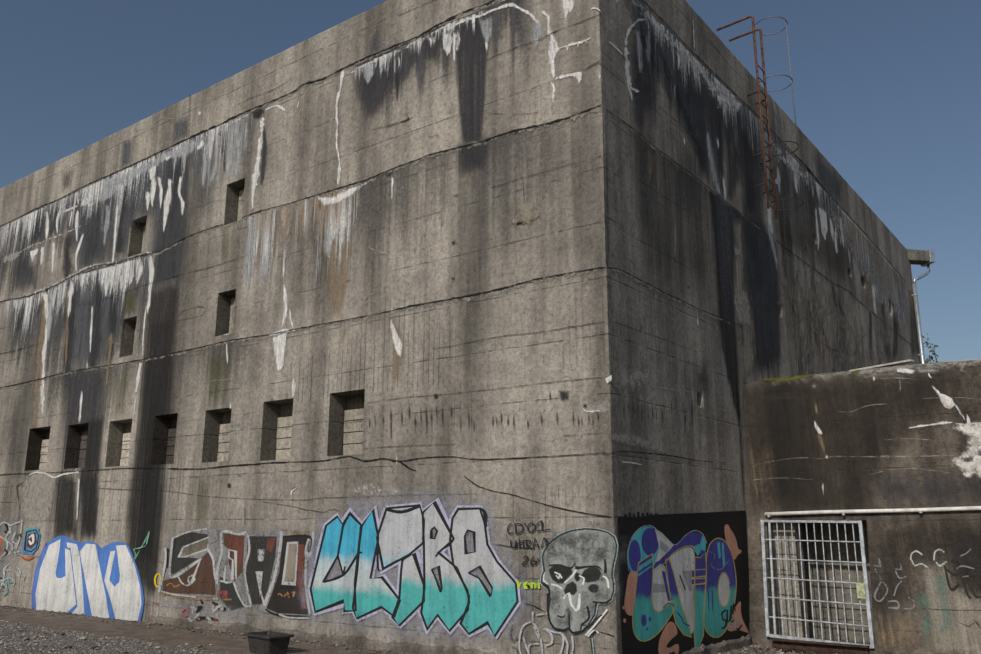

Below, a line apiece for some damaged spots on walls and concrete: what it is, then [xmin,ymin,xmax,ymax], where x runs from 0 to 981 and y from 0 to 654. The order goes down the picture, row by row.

water stain [0,0,590,592]
crack [1,433,713,524]
water stain [599,0,981,510]
water stain [878,522,981,611]